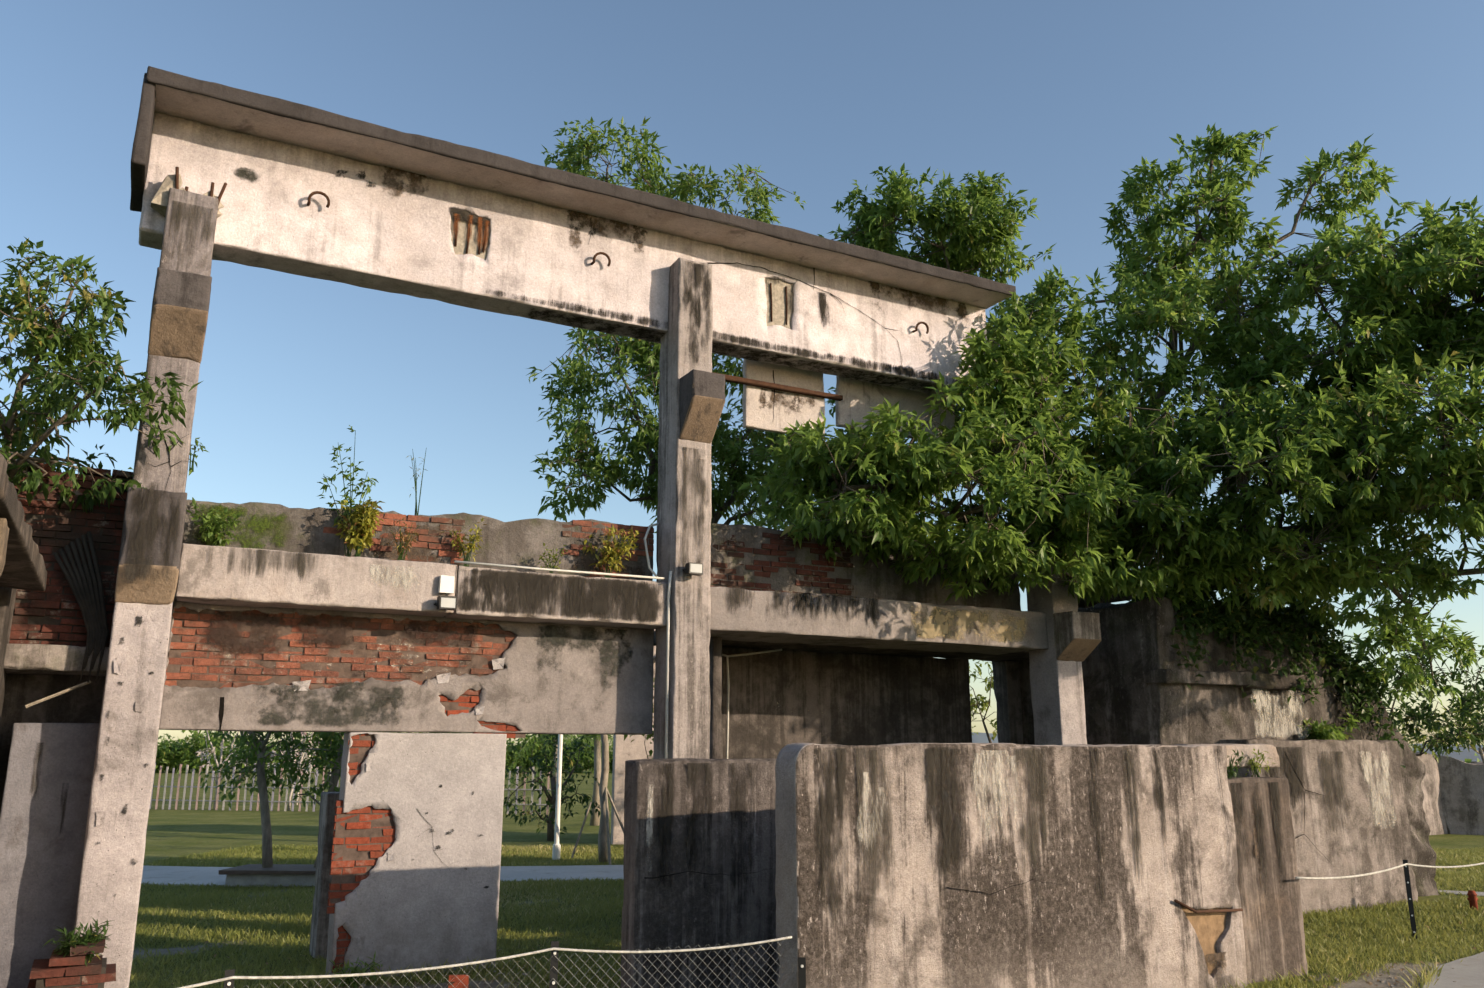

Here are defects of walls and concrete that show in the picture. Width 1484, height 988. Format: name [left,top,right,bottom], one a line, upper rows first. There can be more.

leakage [496,291,667,327]
crack [707,262,902,366]
leakage [683,261,968,384]
rust [759,388,815,411]
peeling [114,616,142,685]
spalling [149,605,526,738]
leakage [260,568,660,726]
peeling [96,804,127,844]
spalling [326,800,395,973]
spalling [348,733,375,784]
leakage [816,747,892,918]
leakage [1125,748,1166,876]